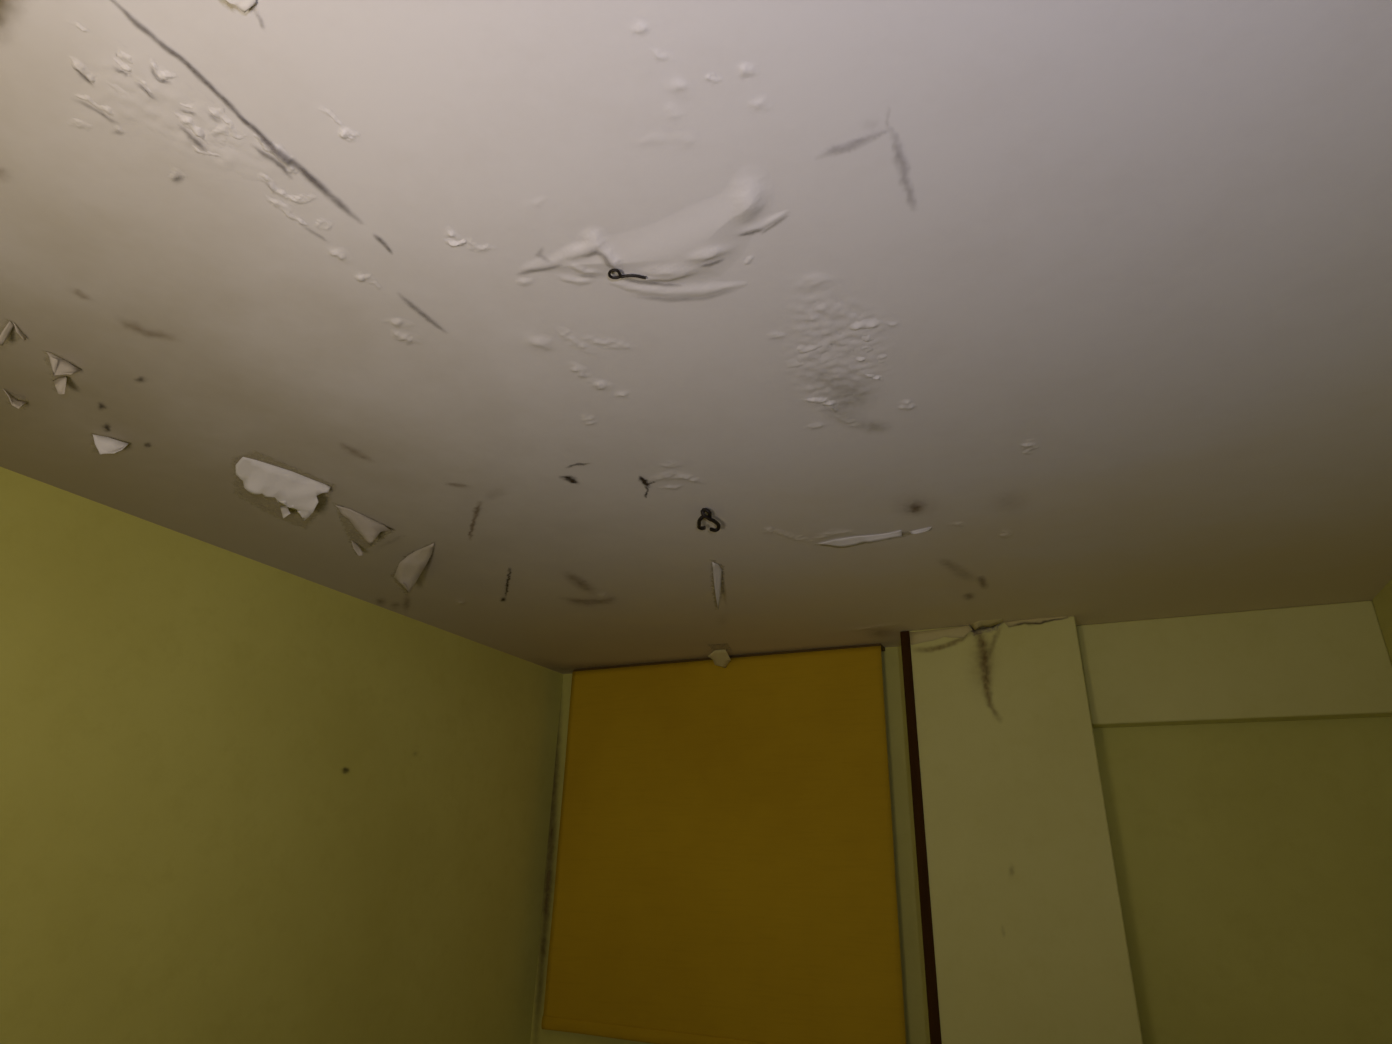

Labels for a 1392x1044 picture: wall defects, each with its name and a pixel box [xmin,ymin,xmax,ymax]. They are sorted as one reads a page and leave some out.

peeling [226,0,256,13]
crack [125,13,342,207]
peeling [45,351,79,394]
peeling [92,434,129,455]
peeling [236,456,393,556]
peeling [816,527,932,548]
peeling [392,543,434,593]